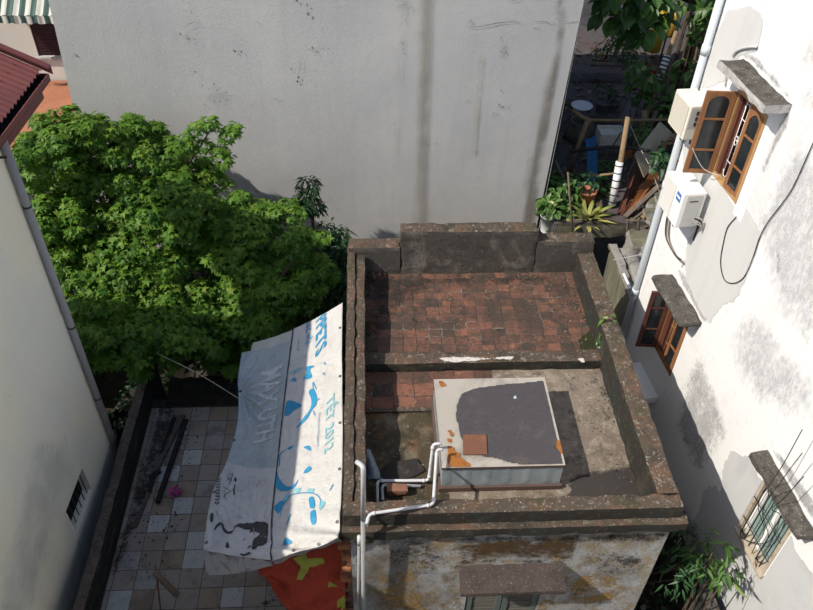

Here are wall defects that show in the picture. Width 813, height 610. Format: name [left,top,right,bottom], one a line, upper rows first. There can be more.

peeling [702,6,763,88]
leakage [525,64,556,222]
peeling [681,173,761,323]
leakage [680,370,721,465]
leakage [567,467,639,497]
leakage [539,533,665,578]
peeling [691,451,813,610]